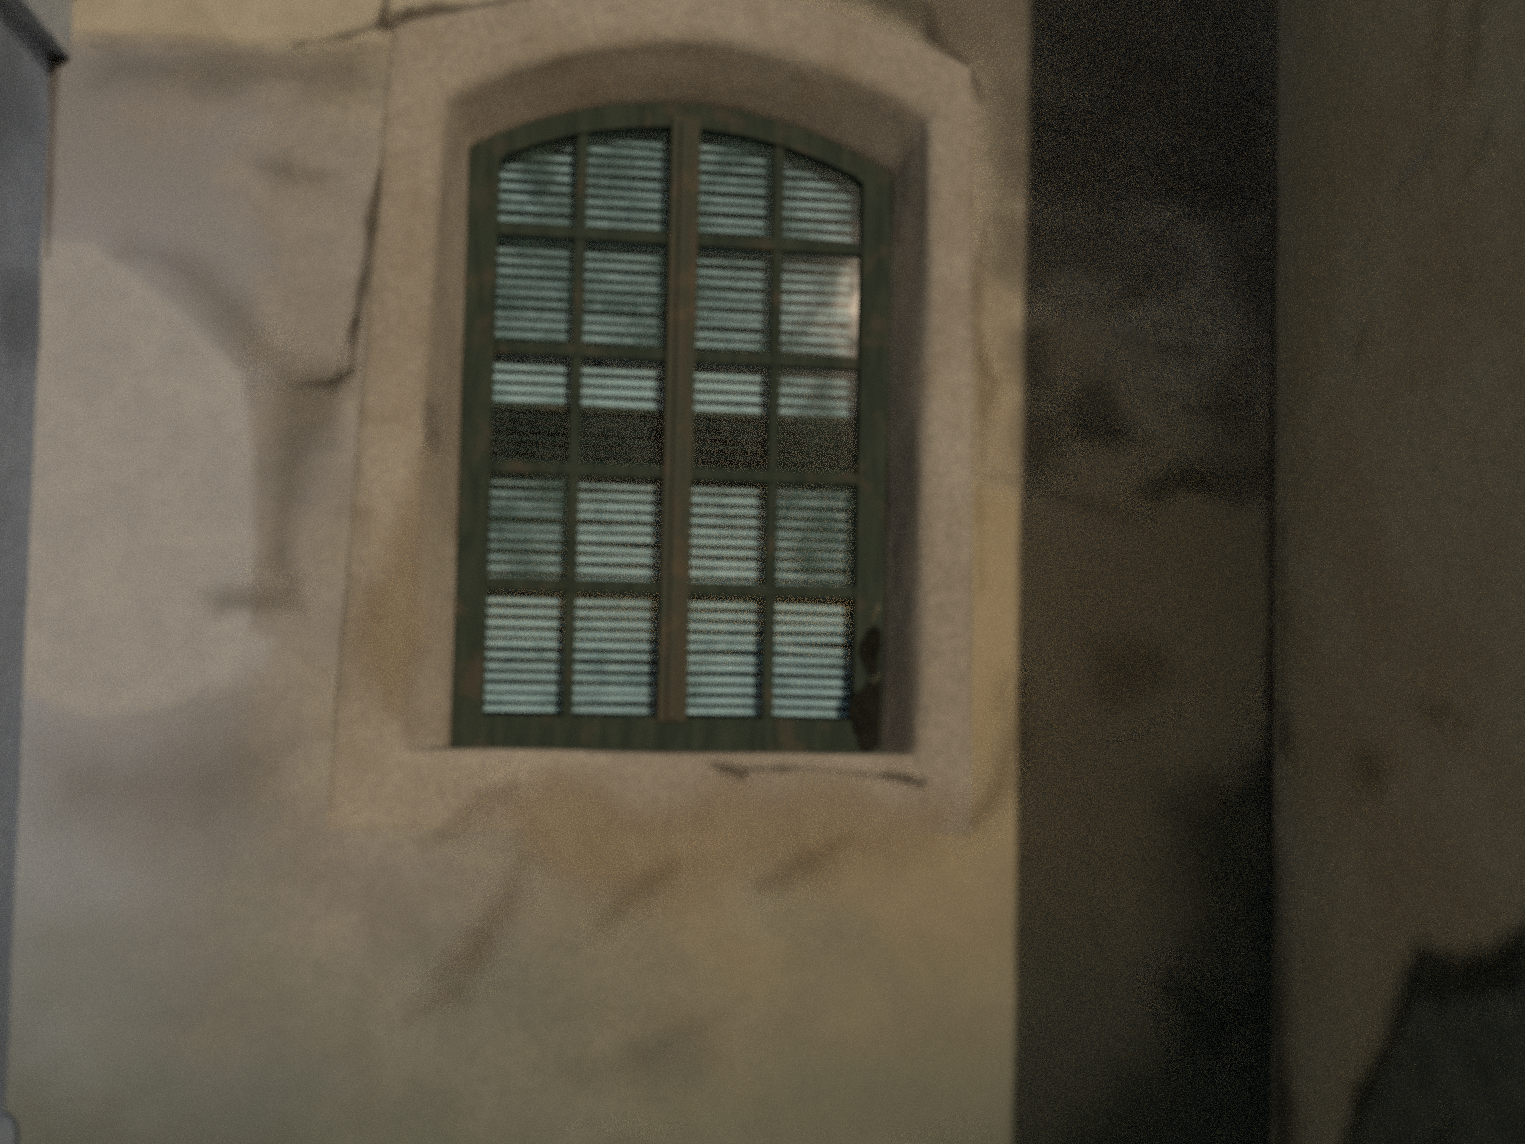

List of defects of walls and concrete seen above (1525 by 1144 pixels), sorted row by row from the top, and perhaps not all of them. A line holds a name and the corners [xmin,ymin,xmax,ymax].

water stain [1111,766,1285,1144]